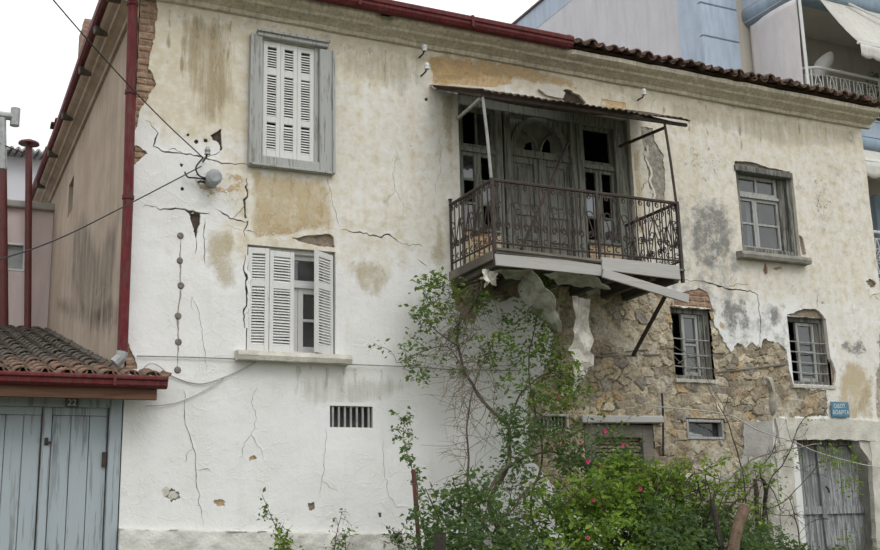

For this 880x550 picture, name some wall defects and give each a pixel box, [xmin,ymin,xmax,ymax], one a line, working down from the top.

spalling [135,0,158,130]
damp [181,21,225,115]
spalling [430,57,513,87]
spalling [641,127,665,204]
crack [144,118,252,328]
spalling [256,211,334,247]
crack [325,179,428,266]
damp [694,209,729,266]
crack [685,277,763,347]
spalling [527,286,834,498]
spalling [161,486,180,502]
crack [184,390,211,526]